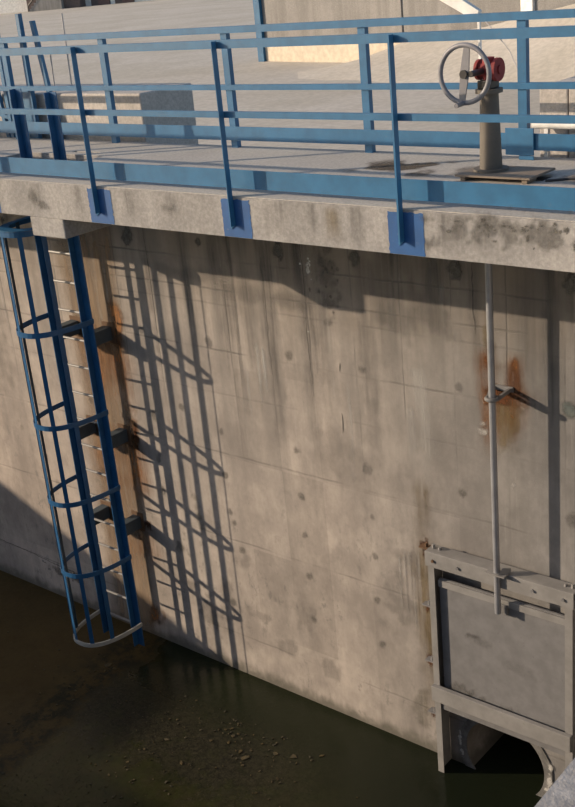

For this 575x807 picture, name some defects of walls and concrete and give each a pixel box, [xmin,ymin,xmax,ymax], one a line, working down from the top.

rust [62,239,79,317]
rust [77,232,143,519]
rust [483,360,526,433]
rust [106,519,129,617]
rust [127,521,160,627]